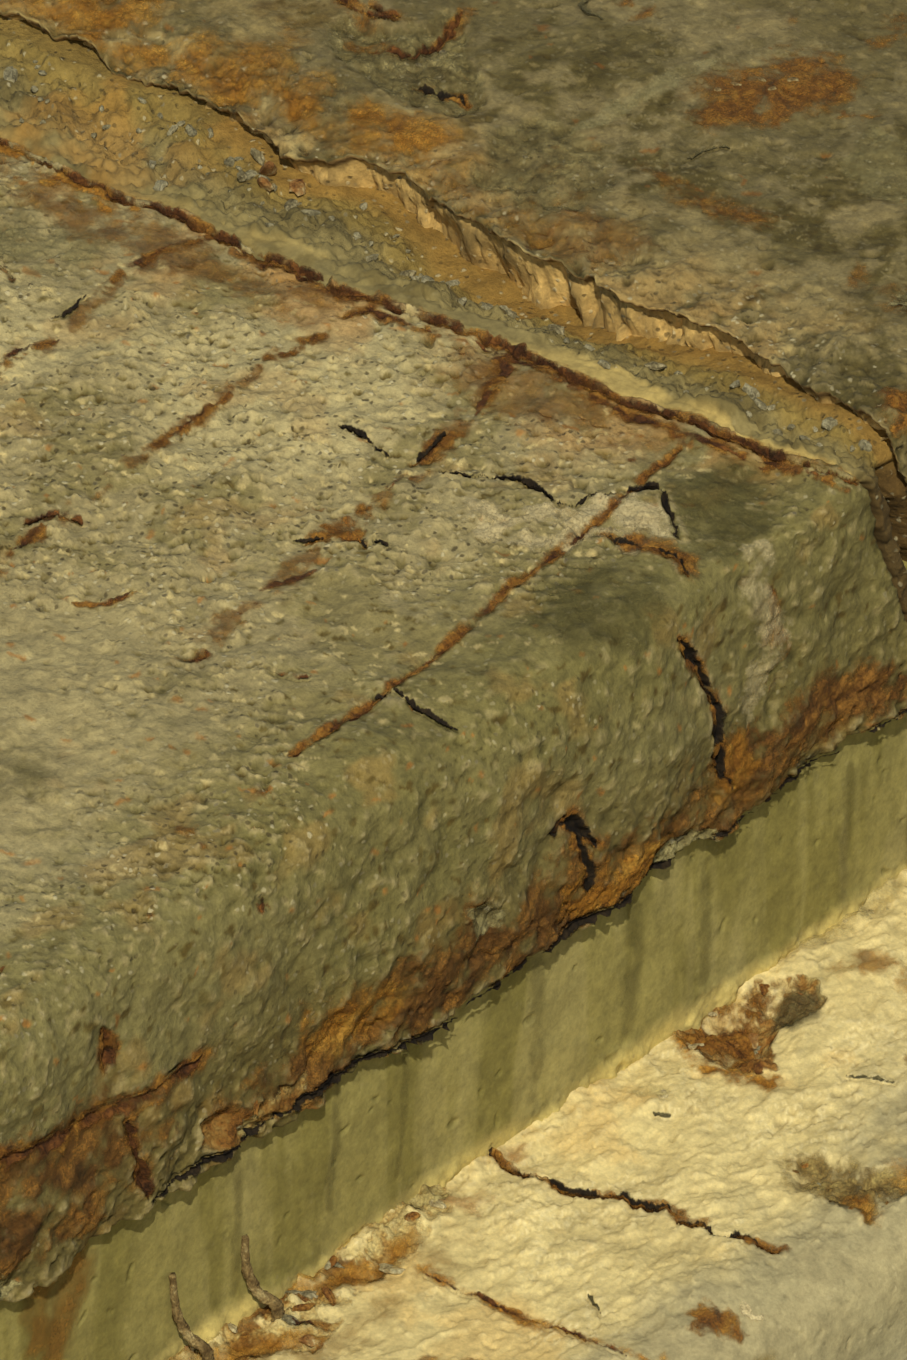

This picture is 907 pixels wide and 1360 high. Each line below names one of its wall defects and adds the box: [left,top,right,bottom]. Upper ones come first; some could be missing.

corrosion [70,234,441,341]
crack [0,0,907,622]
corrosion [287,340,850,756]
crack [124,636,840,1203]
corrosion [244,656,907,1110]
spalling [674,974,827,1091]
spalling [200,1073,313,1151]
crack [489,1147,789,1254]
spalling [784,1153,907,1223]
spalling [168,1184,452,1360]
crack [417,1264,648,1360]
corrosion [687,1303,744,1343]